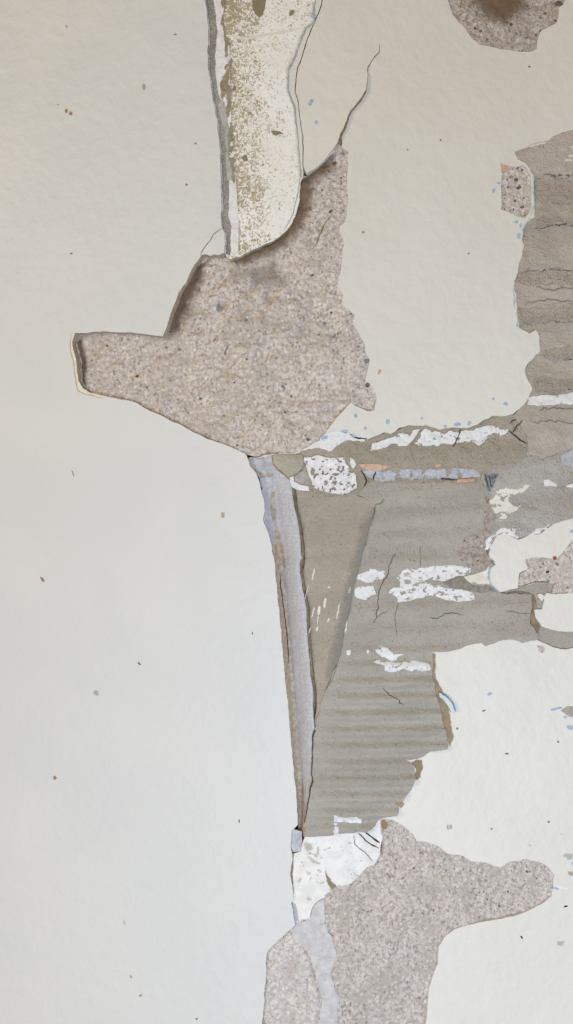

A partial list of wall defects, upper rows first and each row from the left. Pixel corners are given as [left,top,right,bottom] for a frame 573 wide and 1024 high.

spalling [448,0,564,52]
crack [337,45,380,145]
spalling [70,0,381,457]
spalling [492,163,531,239]
spalling [518,530,573,601]
peeling [439,692,456,713]
spalling [263,819,559,1024]